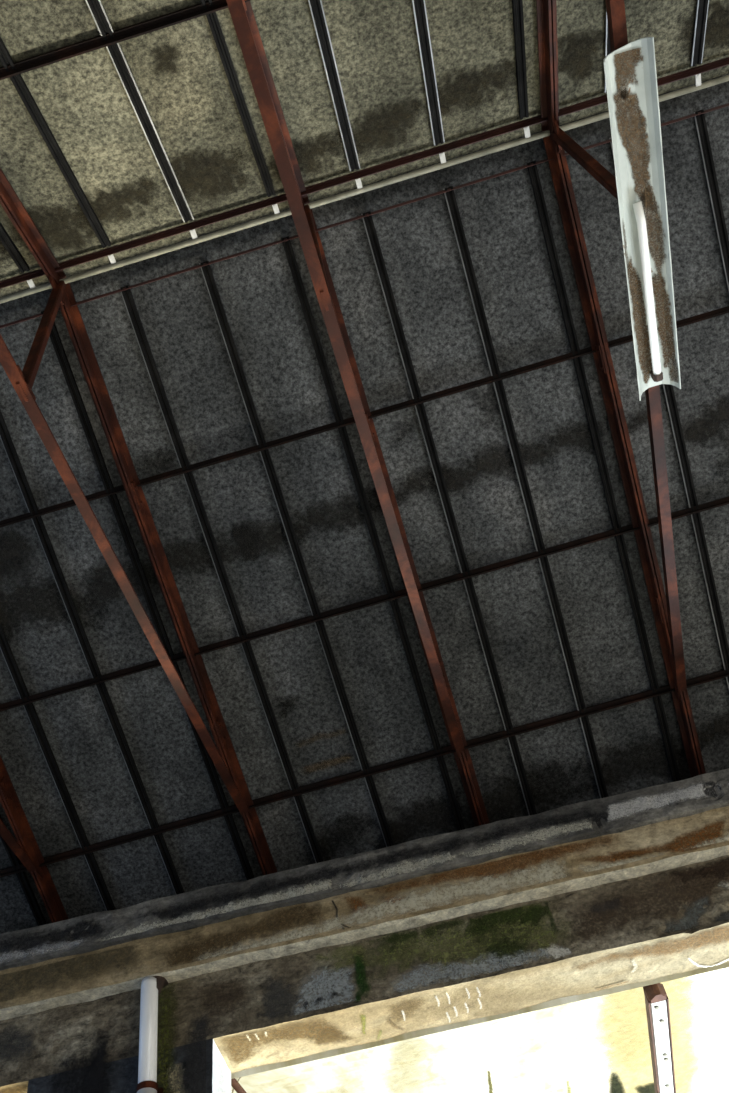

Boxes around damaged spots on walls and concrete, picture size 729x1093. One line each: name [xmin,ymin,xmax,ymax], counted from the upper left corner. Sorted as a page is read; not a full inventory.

water stain [152,47,179,74]
water stain [437,61,516,115]
water stain [680,0,729,55]
water stain [293,100,421,176]
water stain [28,150,248,251]
corrosion [614,48,678,384]
water stain [394,422,603,505]
water stain [167,488,382,574]
water stain [0,532,159,642]
water stain [570,856,729,941]
water stain [601,987,655,1093]
water stain [661,976,695,1093]